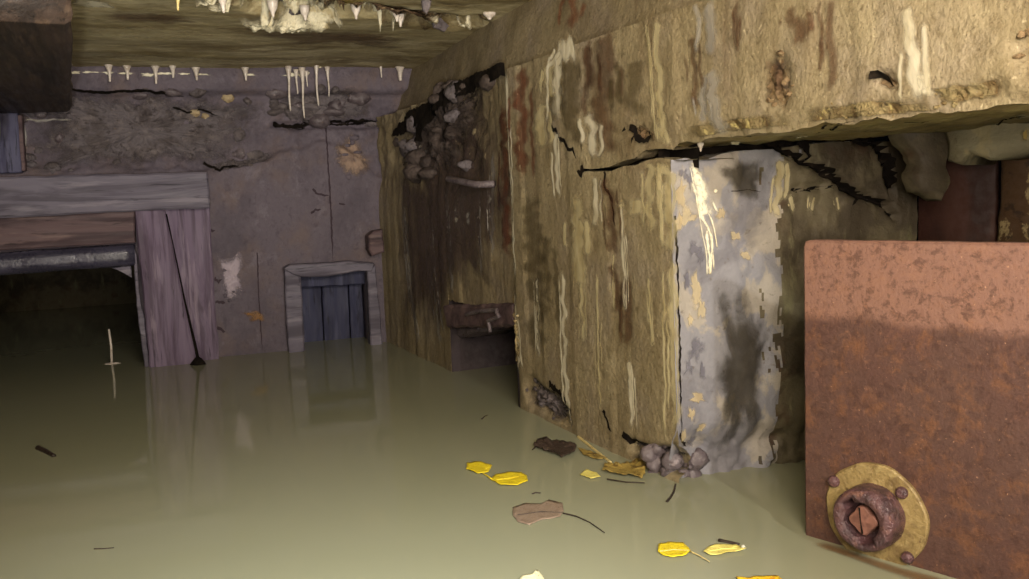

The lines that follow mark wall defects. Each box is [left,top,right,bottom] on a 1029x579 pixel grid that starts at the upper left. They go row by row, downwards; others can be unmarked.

water stain [245,0,406,34]
crack [72,88,217,116]
crack [203,161,239,172]
crack [273,62,505,259]
water stain [402,80,516,335]
water stain [536,36,575,195]
water stain [578,114,604,156]
water stain [646,23,669,143]
crack [549,121,898,225]
peeling [221,257,241,302]
water stain [559,165,725,446]
corrosion [824,545,935,579]